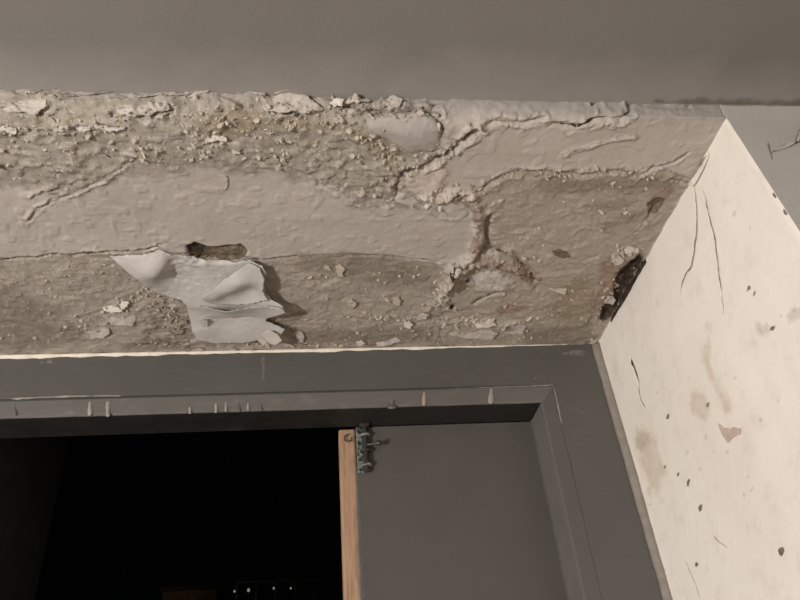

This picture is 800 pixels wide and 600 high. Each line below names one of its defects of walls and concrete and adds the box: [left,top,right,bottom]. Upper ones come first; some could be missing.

peeling [0,89,690,355]
crack [568,153,724,315]
peeling [718,424,741,443]